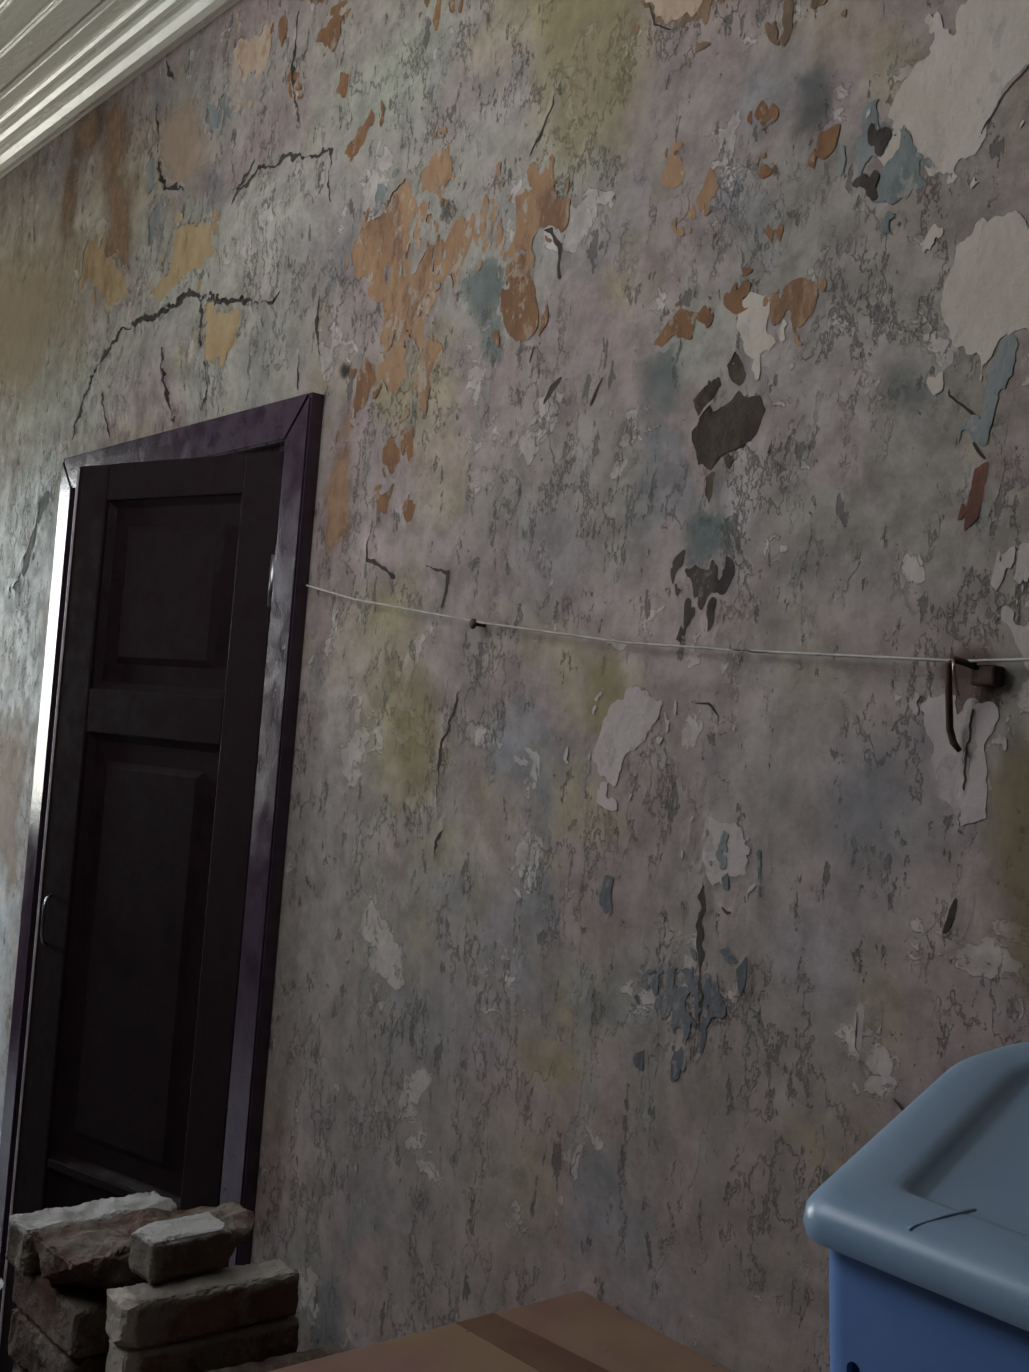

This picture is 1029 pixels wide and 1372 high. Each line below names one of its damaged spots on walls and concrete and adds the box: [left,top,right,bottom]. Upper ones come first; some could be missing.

peeling [626,0,730,56]
peeling [70,138,247,373]
crack [68,6,339,455]
peeling [199,0,570,534]
flaking render [646,263,833,521]
peeling [803,0,1029,552]
peeling [909,526,1029,846]
peeling [673,799,771,906]
peeling [624,937,755,1082]